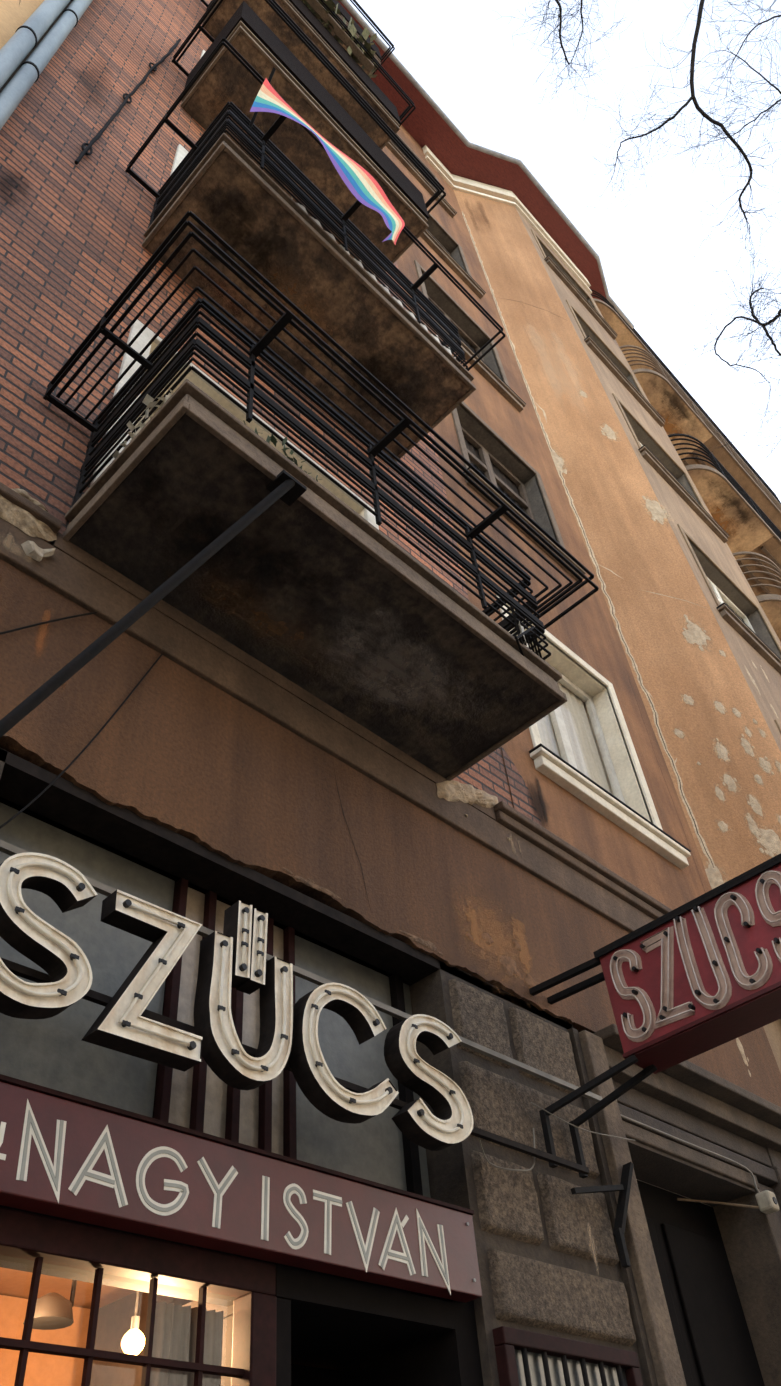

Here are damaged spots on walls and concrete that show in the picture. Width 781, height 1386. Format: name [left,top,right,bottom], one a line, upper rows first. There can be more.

spalling [0,488,58,562]
crack [462,211,715,891]
spalling [683,614,726,657]
spalling [436,746,543,827]
spalling [714,701,781,857]